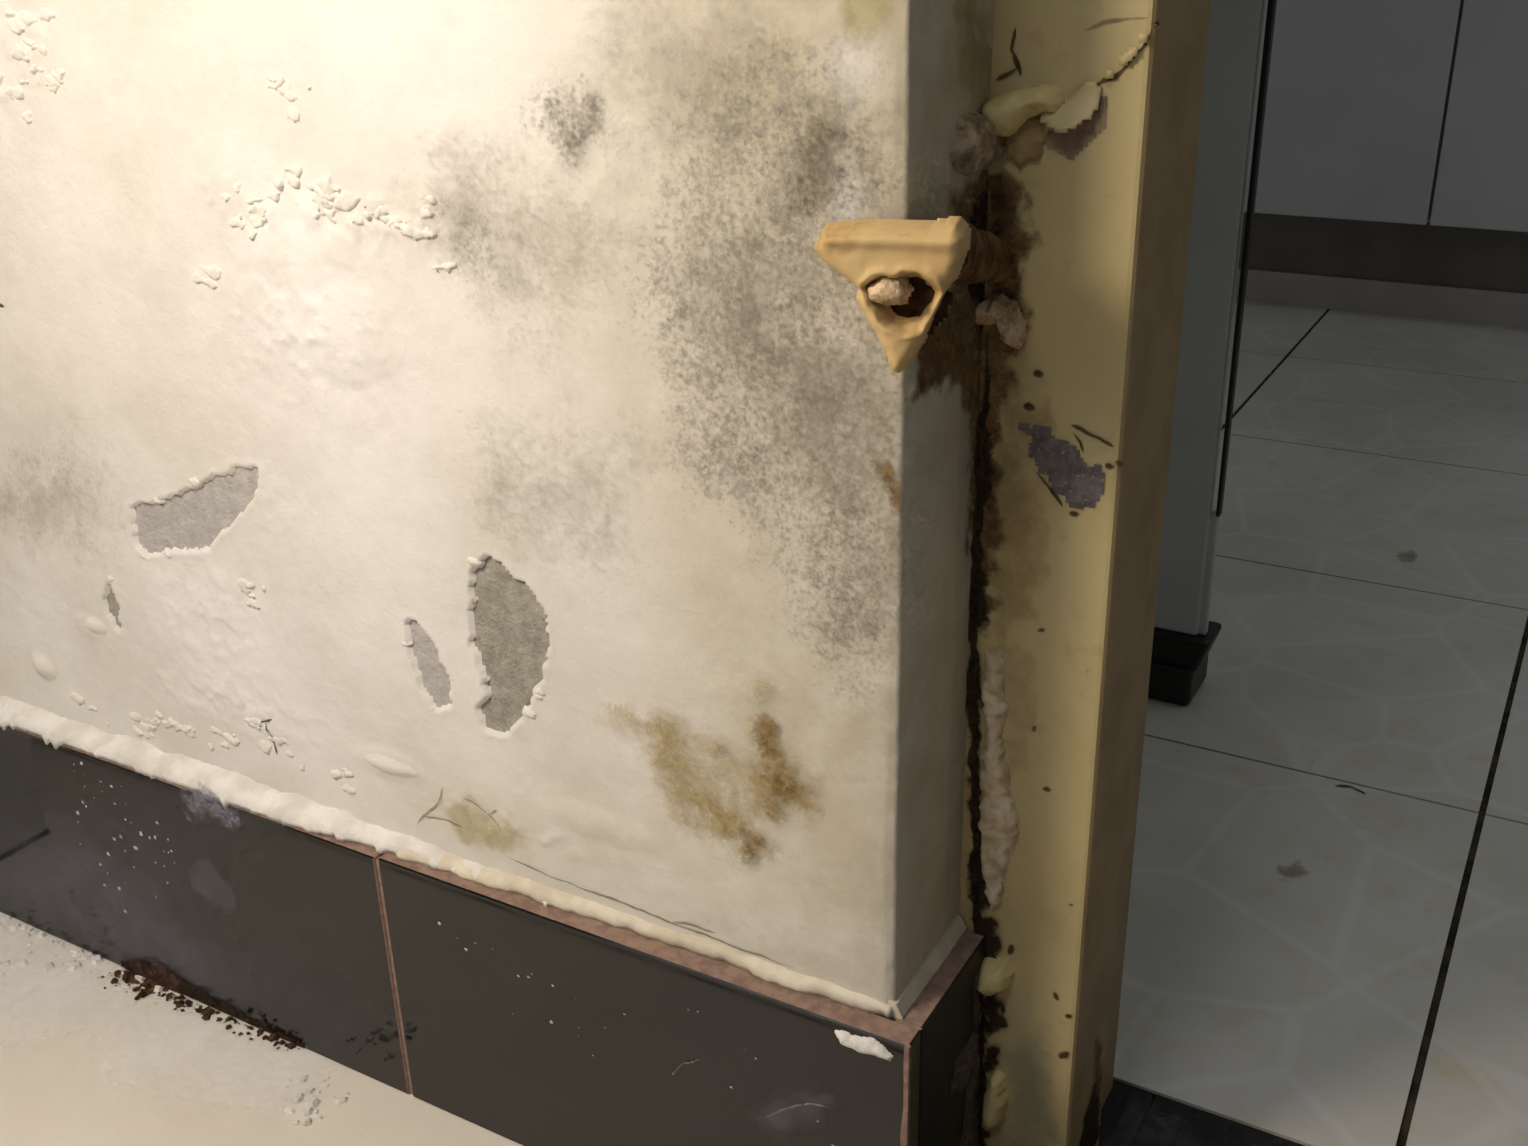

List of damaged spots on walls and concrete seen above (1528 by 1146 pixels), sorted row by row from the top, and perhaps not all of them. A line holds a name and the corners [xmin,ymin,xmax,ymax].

peeling [1040,81,1107,159]
flaking render [134,466,259,561]
water stain [876,463,901,507]
spalling [1018,403,1124,516]
water stain [913,169,1036,959]
flaking render [401,620,454,708]
flaking render [467,556,550,733]
corrosion [121,956,304,1048]
water stain [977,994,1008,1146]